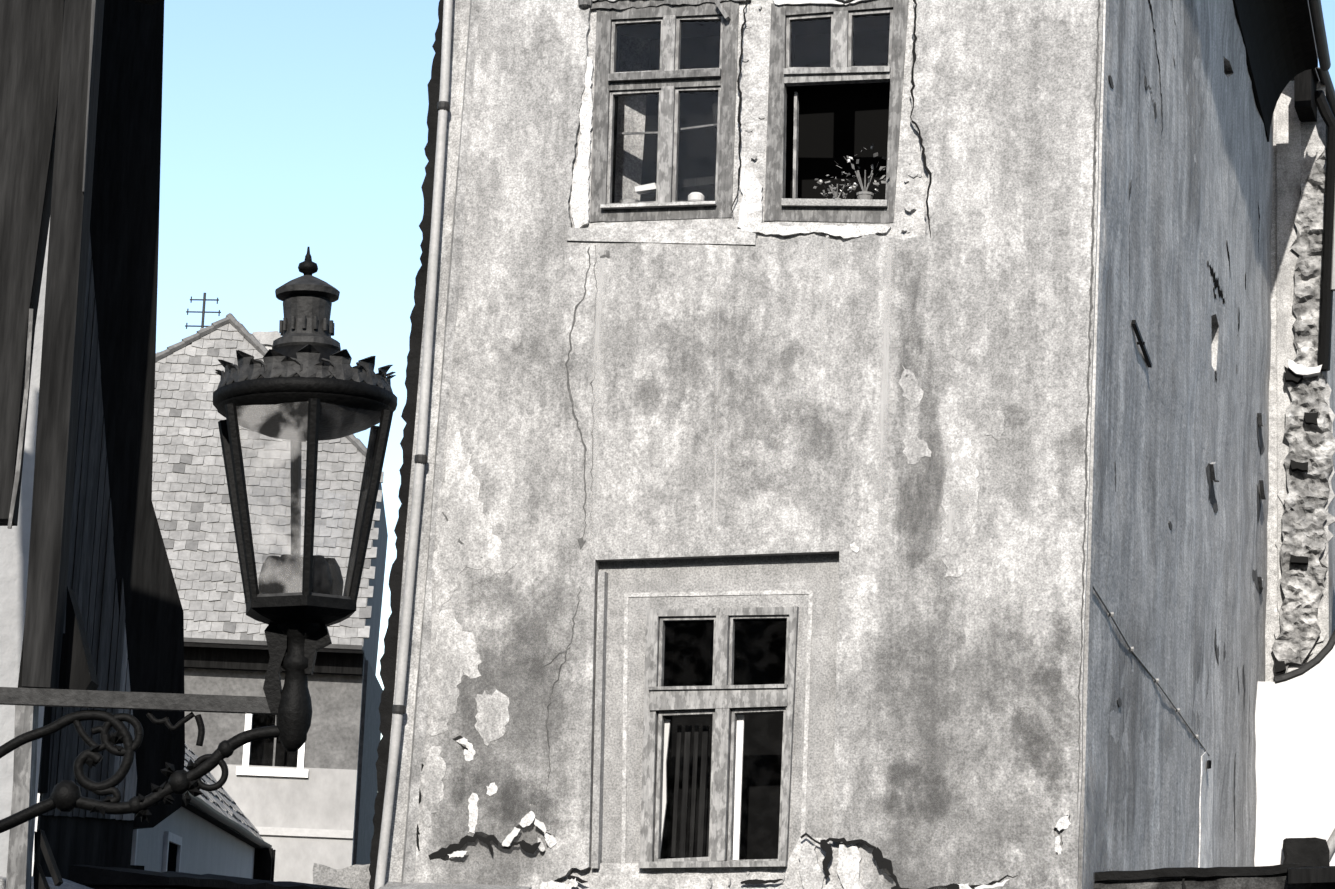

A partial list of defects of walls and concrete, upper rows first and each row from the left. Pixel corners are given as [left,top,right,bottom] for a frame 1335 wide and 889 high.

peeling [570,56,594,228]
peeling [578,0,869,11]
peeling [737,154,916,239]
crack [1126,186,1134,305]
crack [1138,0,1178,133]
crack [565,245,610,549]
crack [1077,0,1116,817]
flaking render [1253,150,1335,674]
peeling [420,429,518,827]
crack [539,586,580,794]
flaking render [438,782,557,866]
flaking render [540,837,894,889]